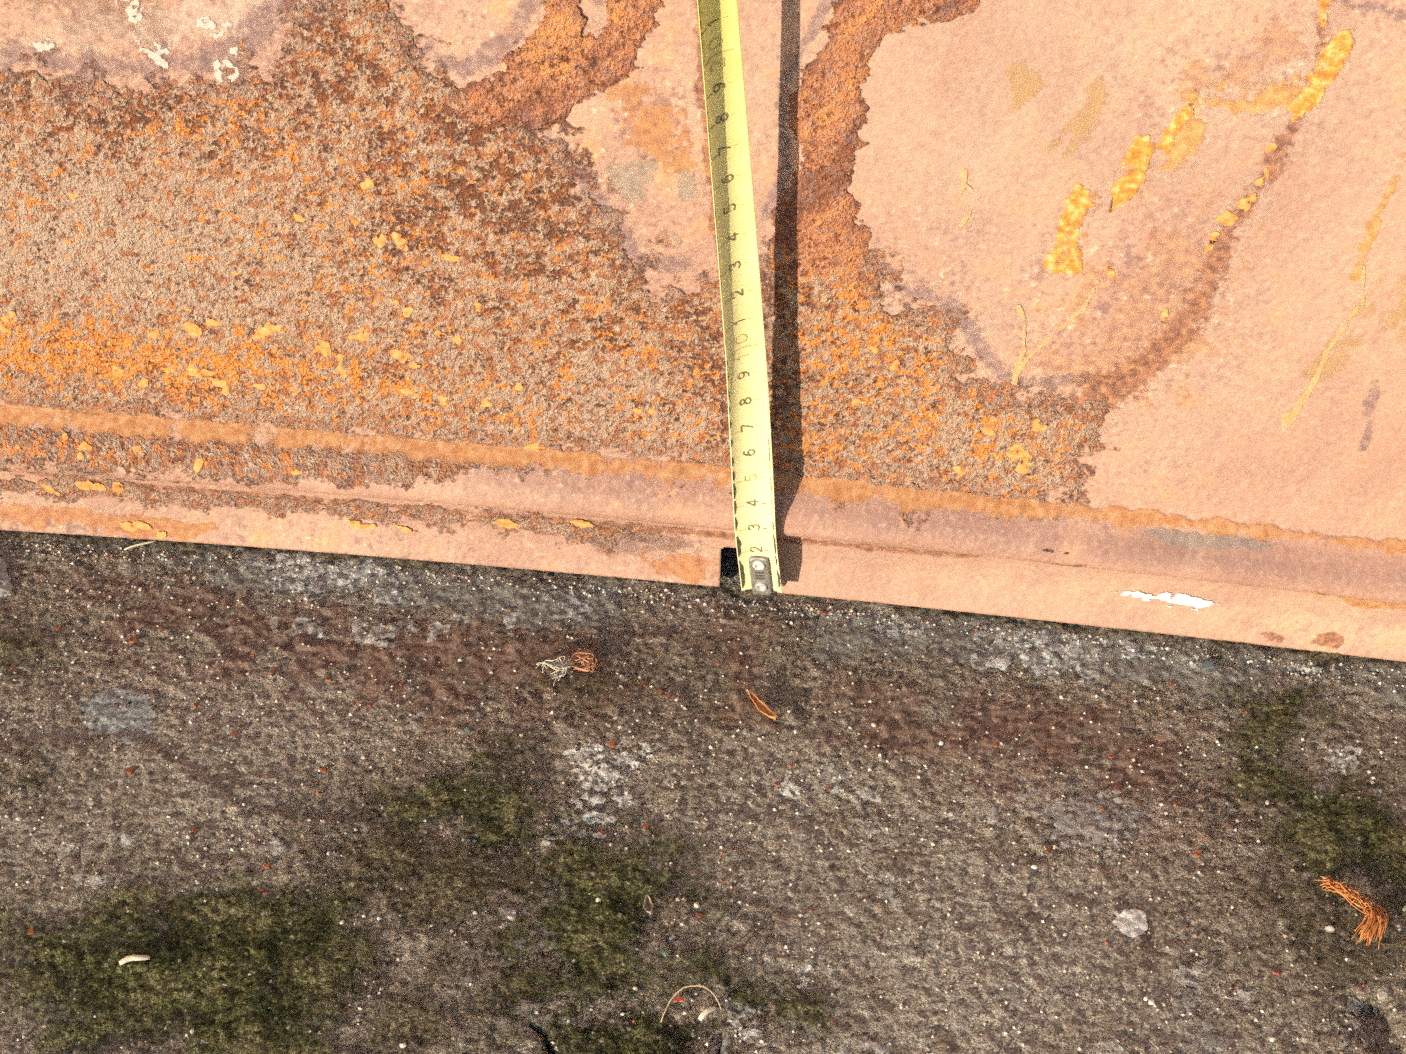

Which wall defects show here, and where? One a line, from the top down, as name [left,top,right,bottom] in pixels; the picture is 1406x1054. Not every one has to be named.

rust [0,0,735,554]
rust [759,0,1406,558]
rust [1312,591,1406,609]
rust [1313,633,1343,648]
leakage [541,742,651,846]
leakage [774,777,801,799]
leakage [812,759,881,838]
leakage [1324,746,1363,775]
leakage [71,871,106,889]
leakage [709,996,767,1054]
leakage [834,1037,890,1054]
leakage [1173,959,1224,1054]